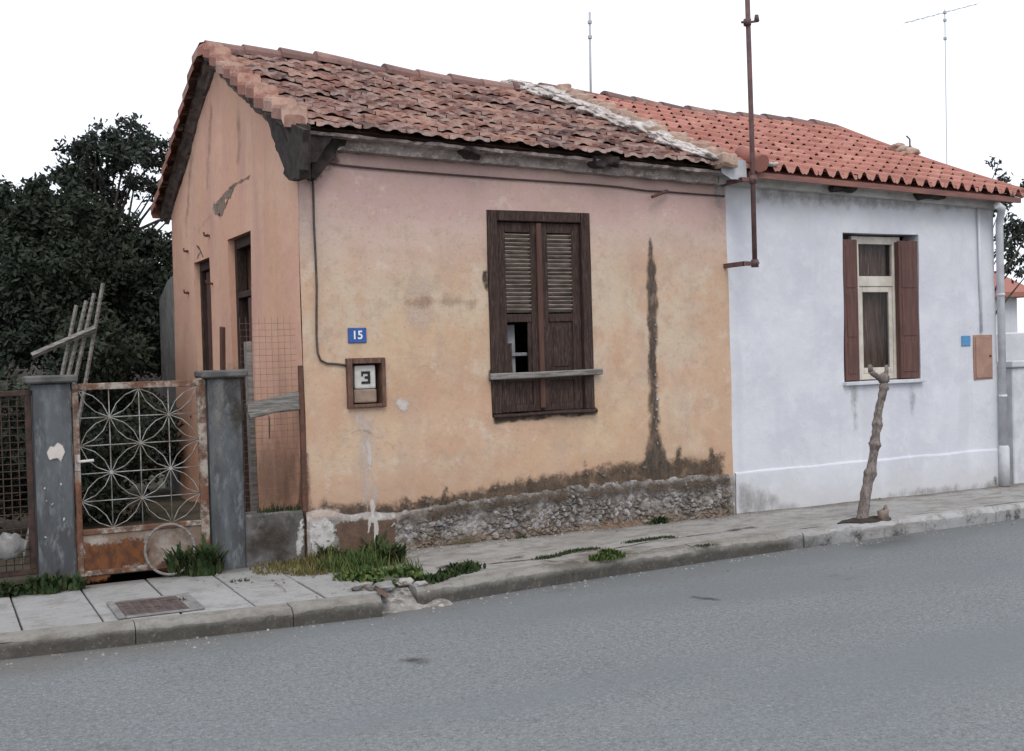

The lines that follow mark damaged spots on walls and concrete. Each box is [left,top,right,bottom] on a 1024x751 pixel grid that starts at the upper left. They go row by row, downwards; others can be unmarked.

flaking render [209,175,250,216]
damp [312,239,731,542]
peeling [47,443,65,461]
corrosion [73,398,150,583]
flaking render [307,474,734,557]